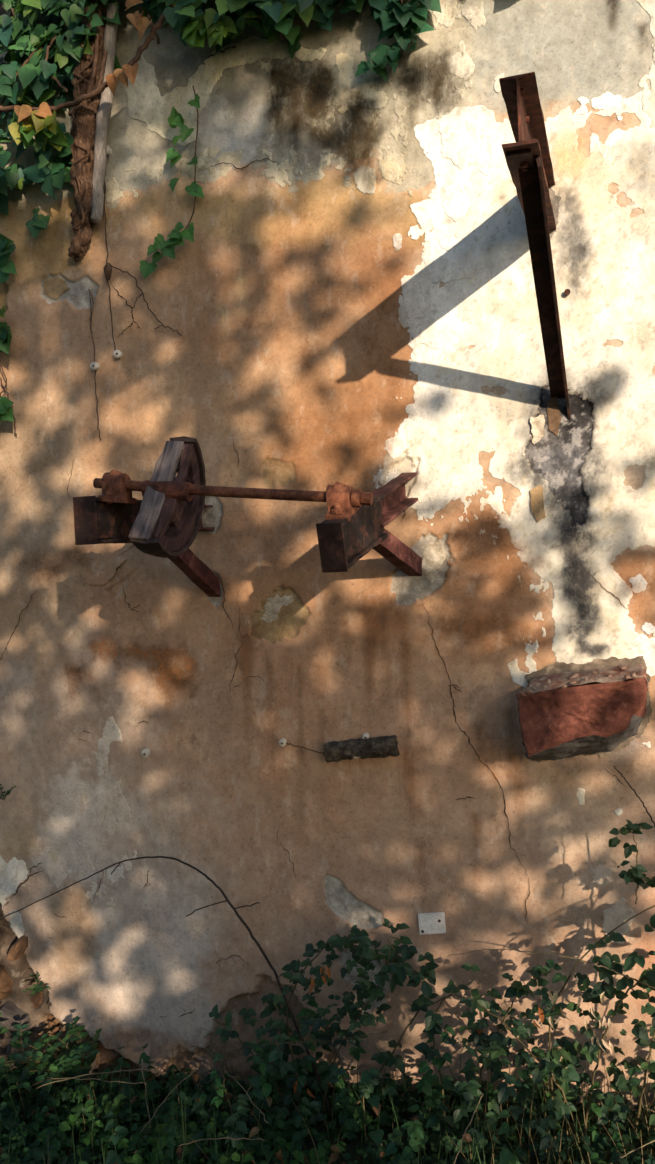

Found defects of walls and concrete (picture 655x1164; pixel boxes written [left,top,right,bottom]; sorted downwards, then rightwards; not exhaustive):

water stain [268,61,382,170]
spalling [40,274,99,310]
peeling [124,0,655,687]
water stain [521,438,564,509]
water stain [552,514,608,656]
crack [421,597,531,923]
peeling [0,855,29,939]
spalling [324,875,383,930]